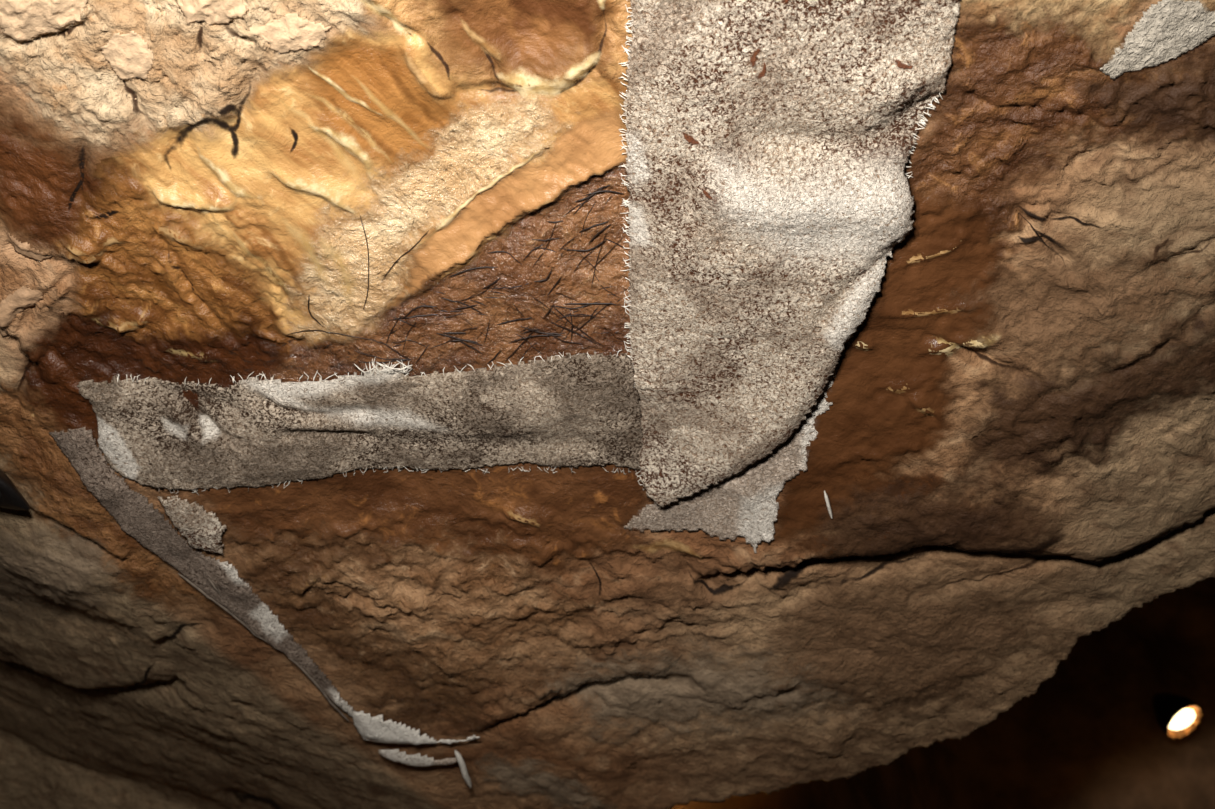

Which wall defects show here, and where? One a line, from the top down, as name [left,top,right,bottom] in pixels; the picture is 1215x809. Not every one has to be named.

crack [165,93,249,163]
crack [290,129,298,151]
crack [1089,515,1204,563]
crack [691,576,740,595]
crack [770,553,925,589]
crack [943,536,1060,586]
crack [508,694,564,719]